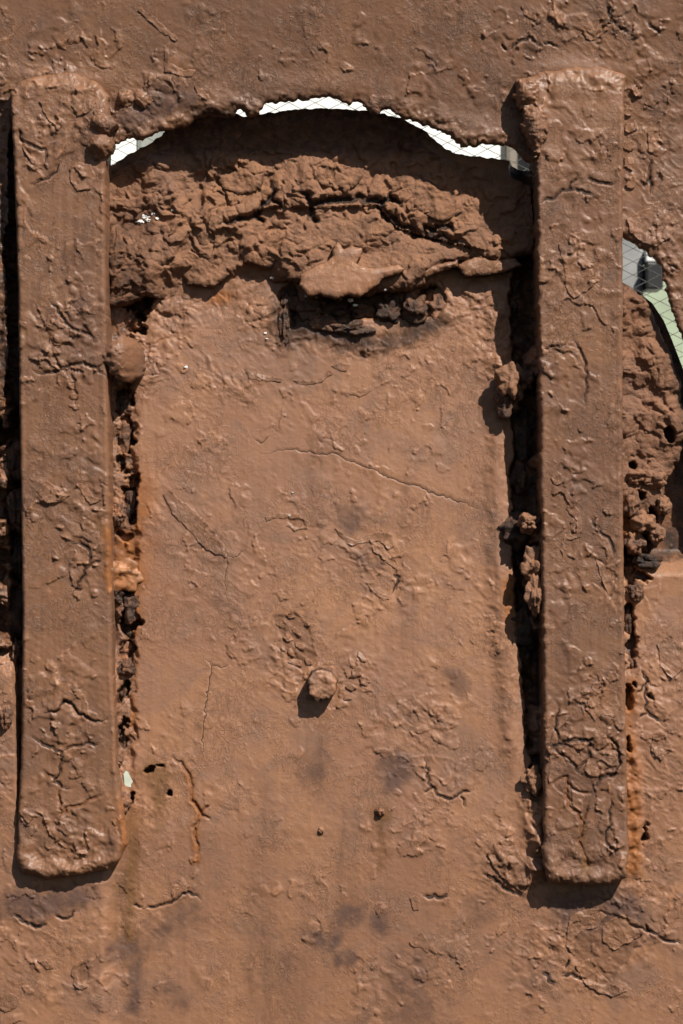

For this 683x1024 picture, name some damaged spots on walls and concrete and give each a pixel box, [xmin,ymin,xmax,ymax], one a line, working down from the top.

crack [258,437,483,511]
corrosion [622,283,683,635]
corrosion [105,391,147,703]
crack [32,700,106,819]
corrosion [118,716,134,766]
crack [544,710,622,870]
corrosion [626,655,635,762]
corrosion [626,782,640,873]